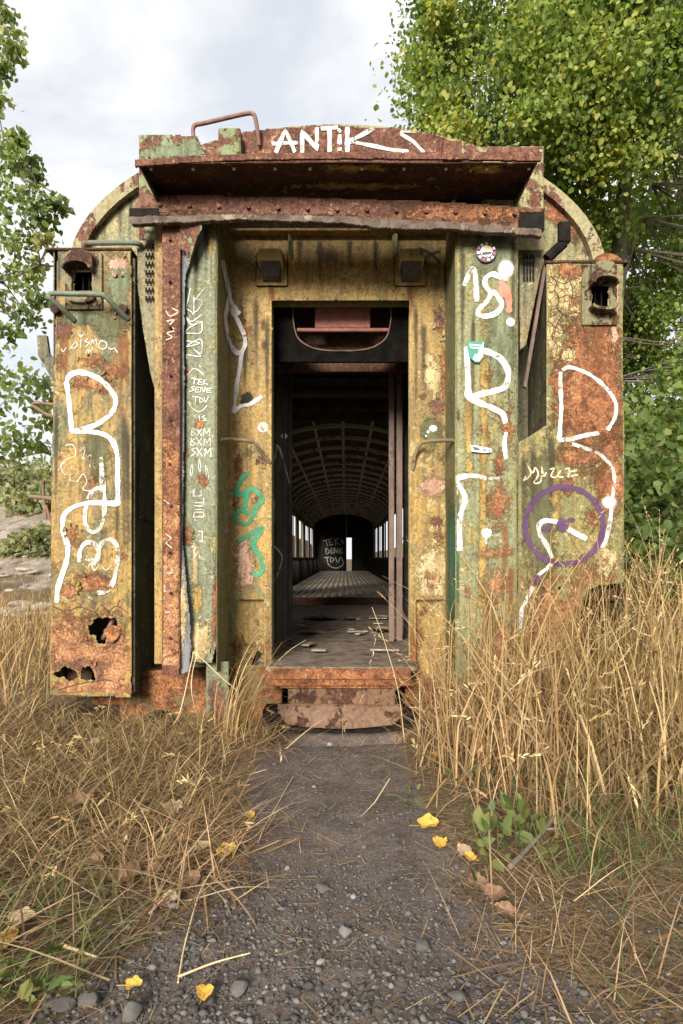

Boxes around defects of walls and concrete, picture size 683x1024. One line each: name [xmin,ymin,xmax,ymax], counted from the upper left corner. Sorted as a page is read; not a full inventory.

peeling [140,138,205,159]
corrosion [487,146,543,162]
corrosion [55,307,131,395]
crack [548,276,579,355]
peeling [411,233,518,627]
corrosion [546,293,624,540]
corrosion [162,421,194,666]
corrosion [465,392,619,690]
corrosion [50,569,131,697]